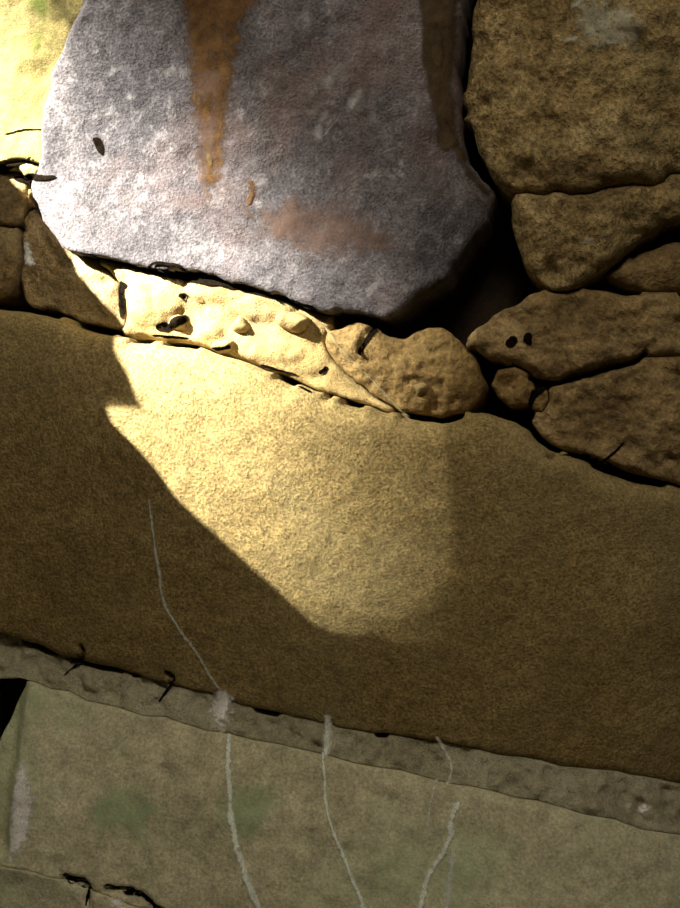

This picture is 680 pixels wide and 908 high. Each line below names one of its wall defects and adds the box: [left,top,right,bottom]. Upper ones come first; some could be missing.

rust [183,0,254,194]
rust [242,180,255,219]
crack [65,874,160,908]